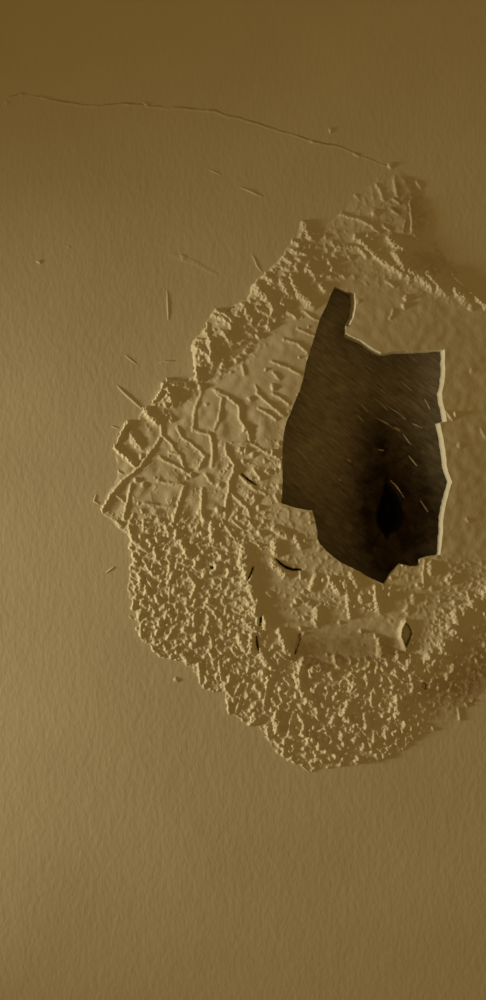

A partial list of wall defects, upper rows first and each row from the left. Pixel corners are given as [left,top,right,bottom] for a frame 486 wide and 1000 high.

flaking render [116,162,486,772]